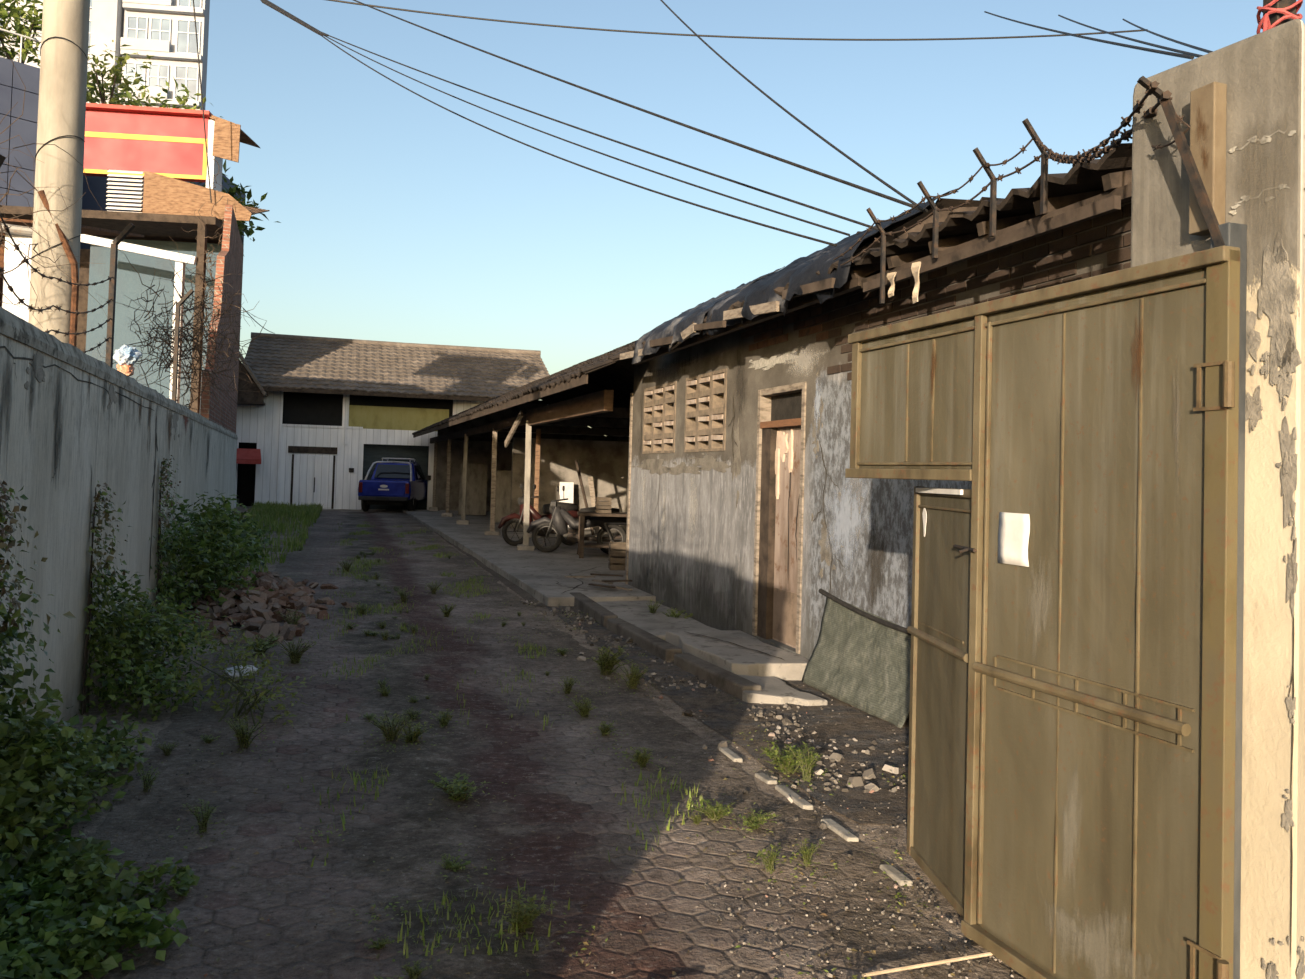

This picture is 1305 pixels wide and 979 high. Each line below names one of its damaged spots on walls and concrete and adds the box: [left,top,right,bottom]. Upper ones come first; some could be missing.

leakage [0,361,12,450]
leakage [54,376,62,471]
peeling [1245,232,1302,617]
leakage [868,530,884,605]
peeling [1262,936,1305,979]